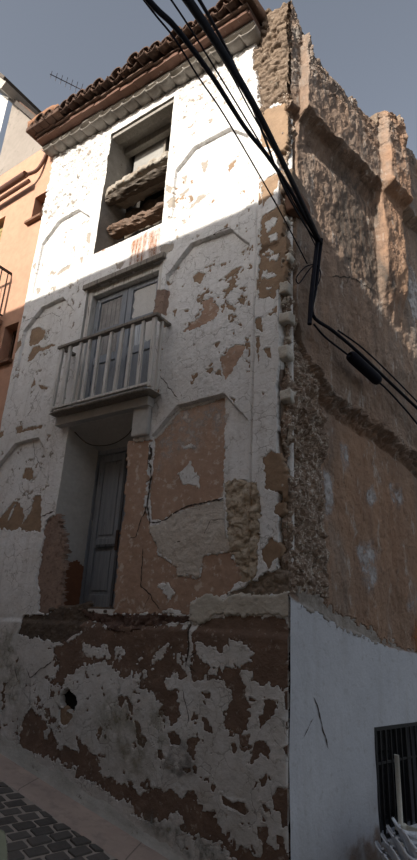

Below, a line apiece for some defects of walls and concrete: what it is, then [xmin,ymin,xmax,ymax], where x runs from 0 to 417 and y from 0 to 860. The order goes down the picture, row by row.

peeling [33,220,91,299]
peeling [16,327,55,362]
spalling [113,2,417,654]
peeling [16,421,54,442]
crack [131,445,223,610]
peeling [0,451,291,860]
crack [305,698,328,746]